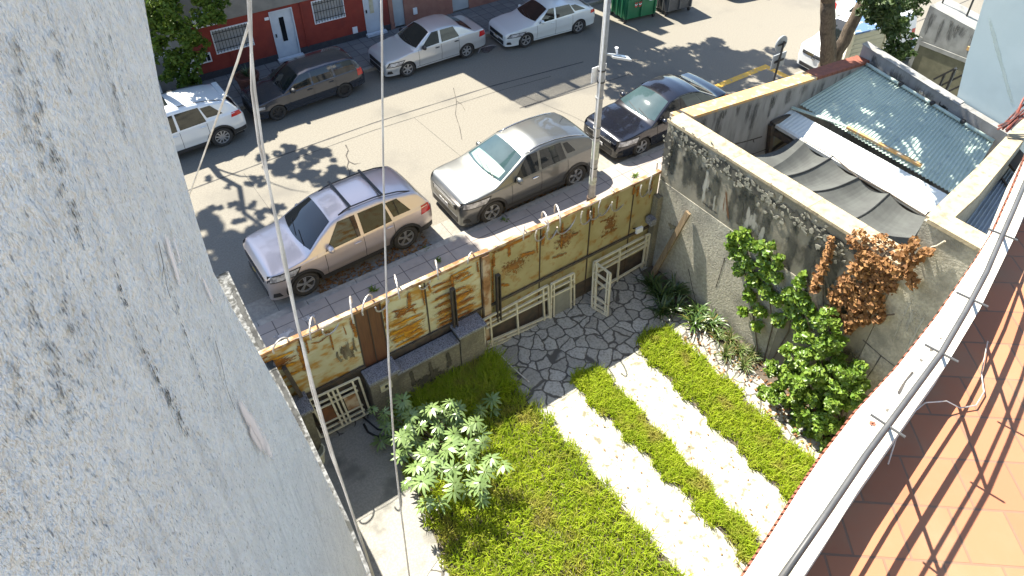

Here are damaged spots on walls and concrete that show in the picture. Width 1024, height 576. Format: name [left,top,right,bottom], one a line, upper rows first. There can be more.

rust [383,196,619,348]
peeling [661,116,846,264]
water stain [668,134,857,305]